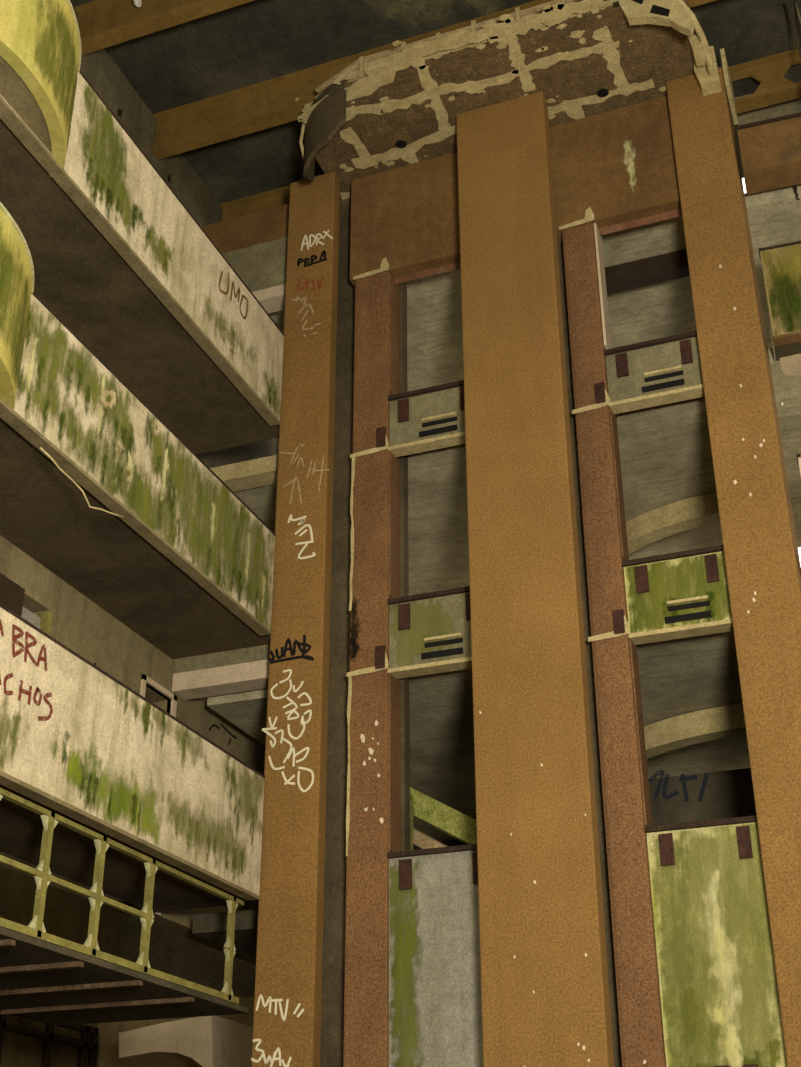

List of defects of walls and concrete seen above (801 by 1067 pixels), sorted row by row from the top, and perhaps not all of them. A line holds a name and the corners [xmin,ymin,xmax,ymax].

peeling [295,95,328,124]
peeling [335,0,667,172]
leakage [85,144,119,219]
leakage [18,313,45,409]
leakage [68,374,105,412]
leakage [205,301,253,357]
leakage [90,408,133,494]
leakage [156,449,180,541]
leakage [218,552,266,618]
leakage [125,689,165,745]
leakage [207,805,255,880]
leakage [711,871,778,1067]